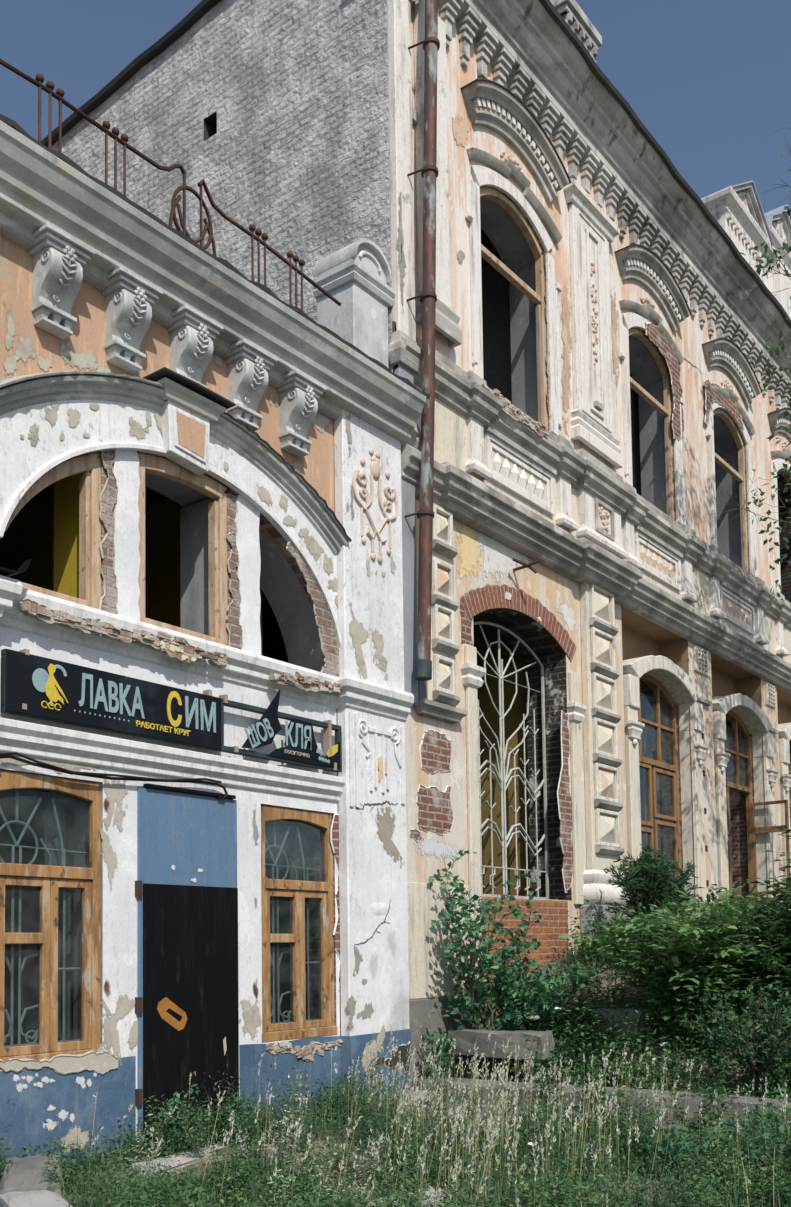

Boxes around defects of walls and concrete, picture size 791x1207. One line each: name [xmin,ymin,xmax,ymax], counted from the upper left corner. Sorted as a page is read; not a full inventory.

peeling [3,302,113,377]
peeling [20,402,100,446]
peeling [128,411,163,440]
spalling [19,450,243,667]
spalling [257,484,389,694]
spalling [376,729,465,868]
spalling [239,813,374,1062]
crack [354,900,391,945]
spalling [0,989,138,1093]
spalling [361,1025,412,1073]